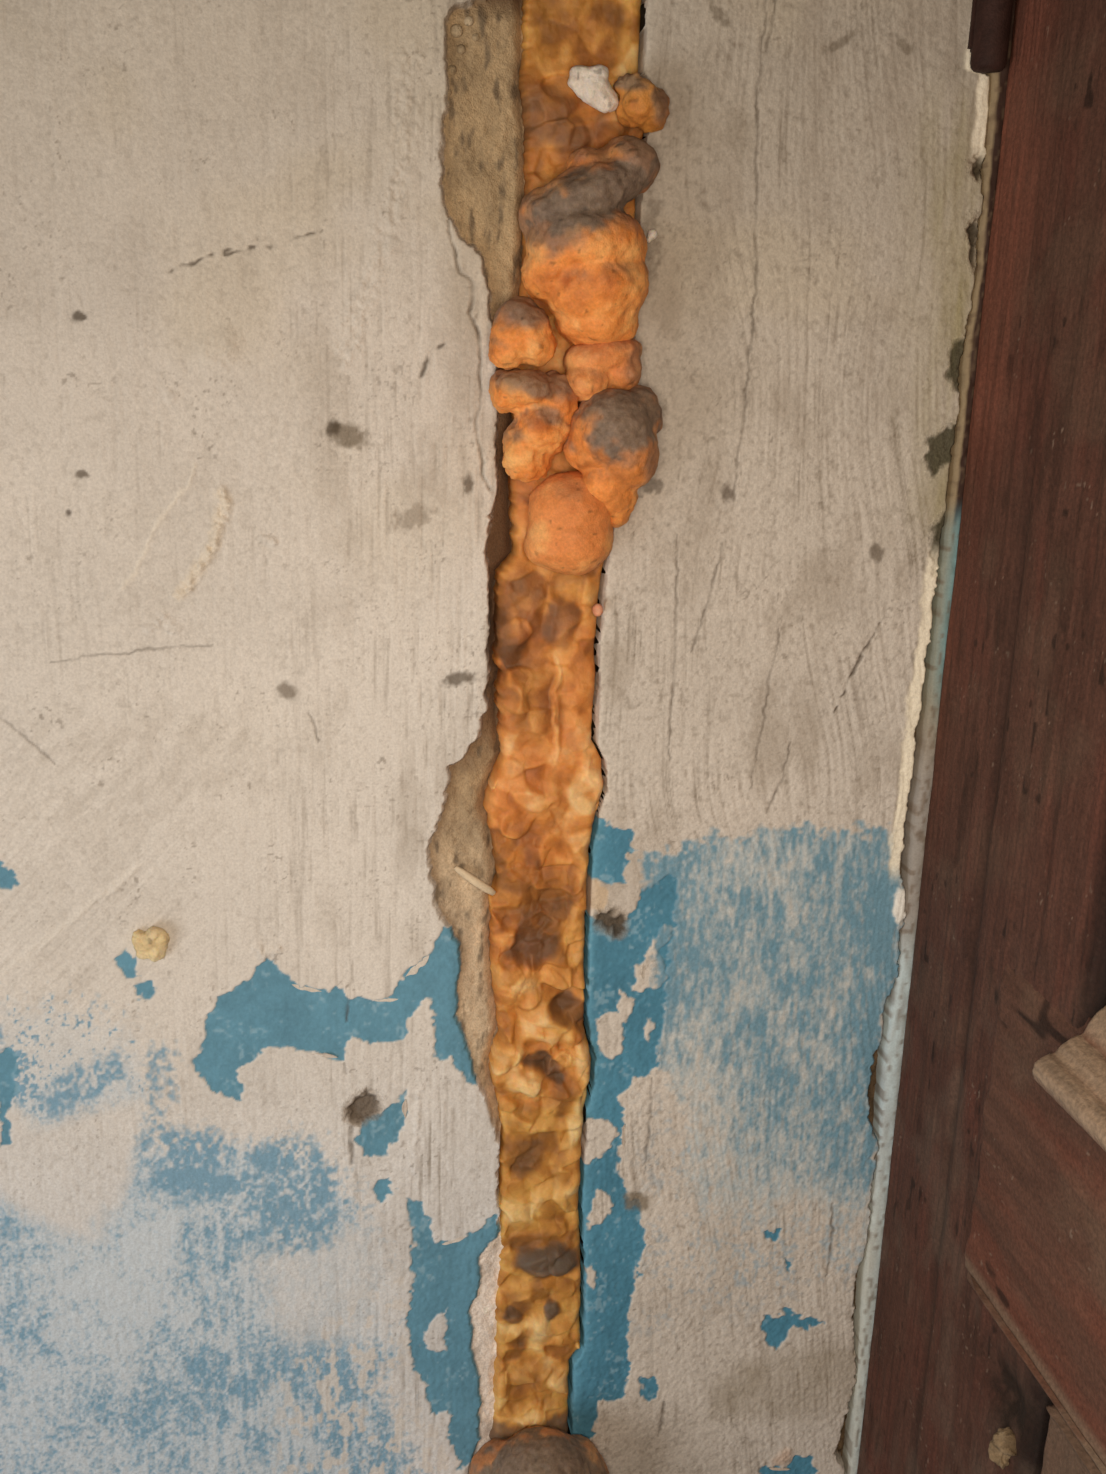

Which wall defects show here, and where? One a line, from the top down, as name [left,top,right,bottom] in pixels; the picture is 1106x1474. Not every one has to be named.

flaking render [438,0,525,326]
peeling [0,854,25,896]
peeling [186,411,513,1474]
peeling [107,943,164,1007]
peeling [0,1039,27,1155]
peeling [567,812,685,1445]
peeling [760,1225,795,1281]
peeling [757,1304,828,1346]
peeling [754,1449,822,1474]